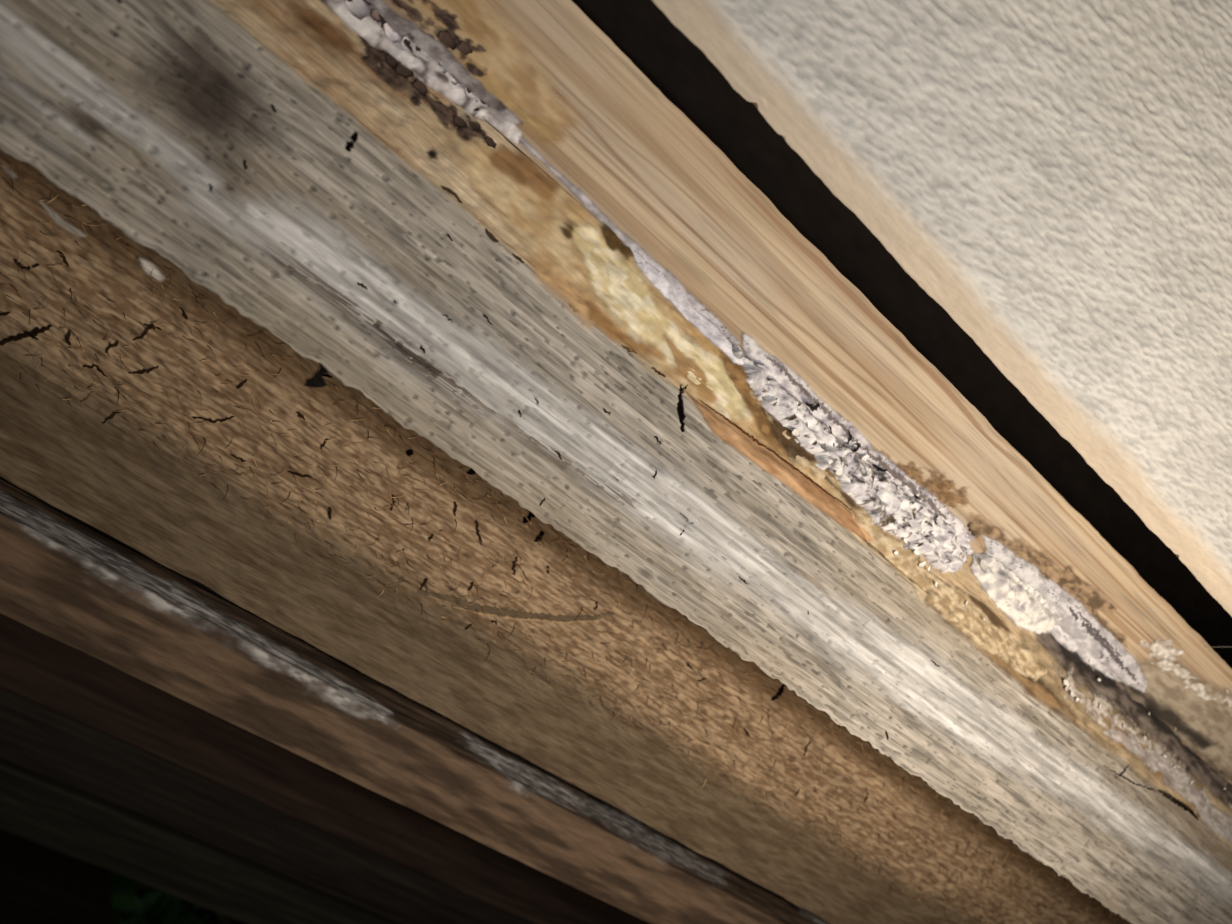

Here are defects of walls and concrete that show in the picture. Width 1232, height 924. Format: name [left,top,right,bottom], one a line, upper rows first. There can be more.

leakage [0,4,220,193]
peeling [386,55,428,97]
peeling [438,31,473,55]
peeling [454,108,497,149]
leakage [253,0,1232,843]
leakage [0,490,394,725]
leakage [462,732,725,885]